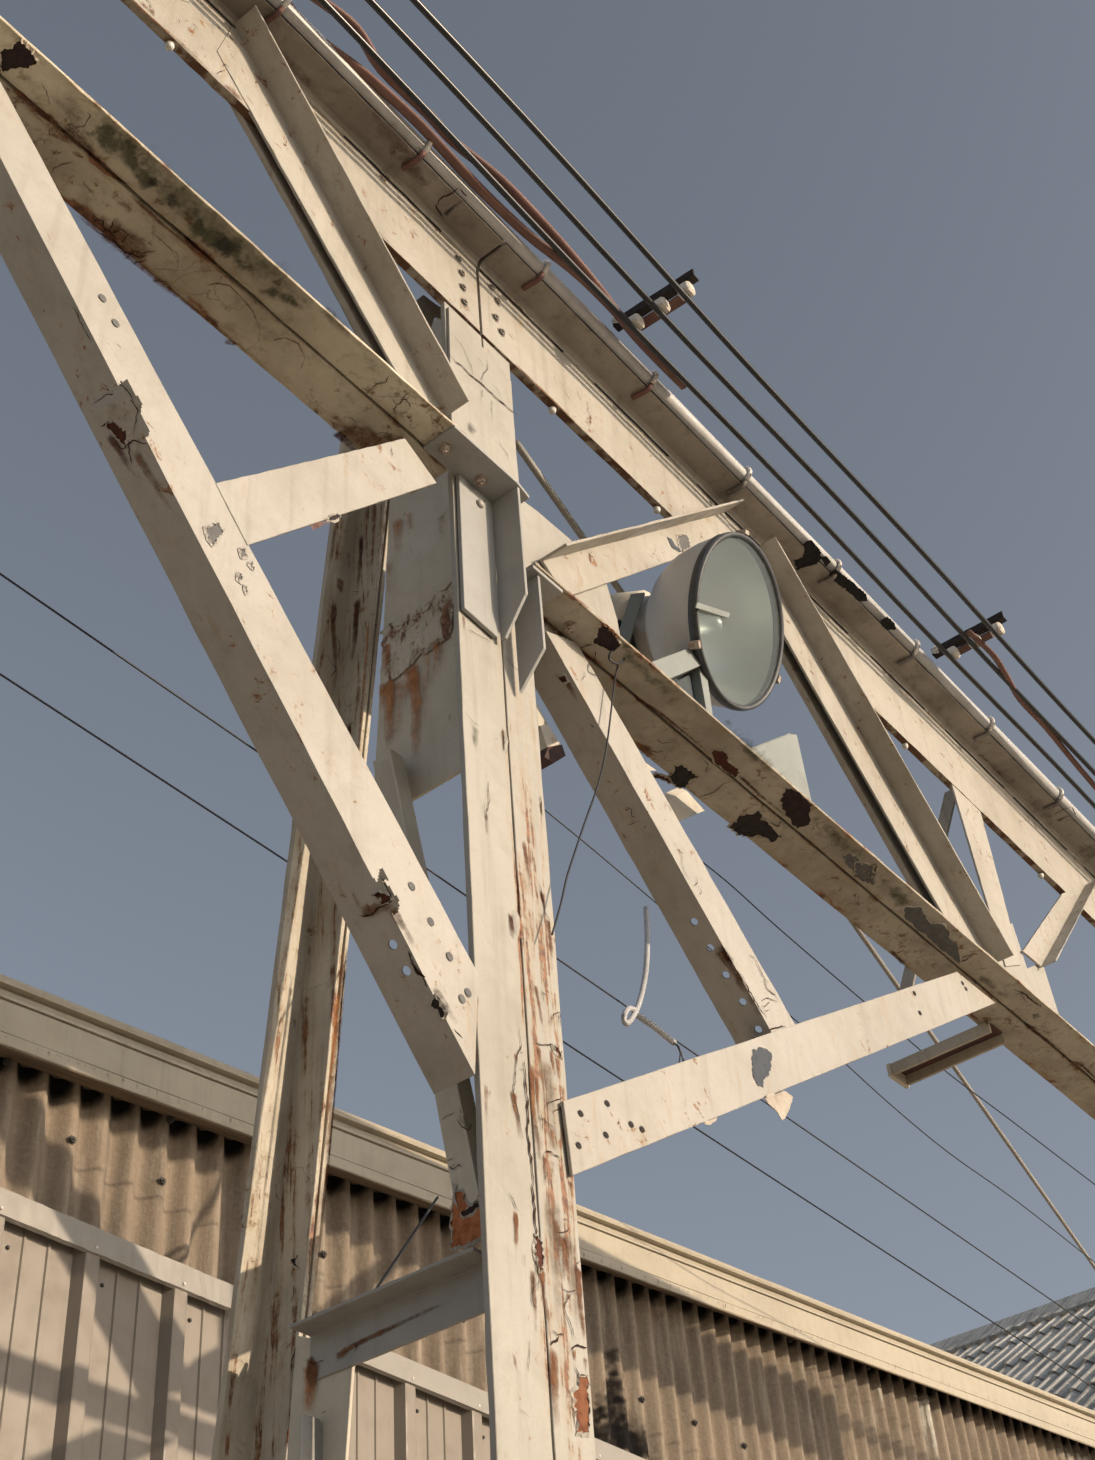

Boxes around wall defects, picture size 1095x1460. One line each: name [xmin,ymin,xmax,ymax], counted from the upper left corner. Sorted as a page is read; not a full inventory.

peeling [0,37,40,74]
water stain [99,124,298,306]
rust [329,537,438,738]
peeling [646,763,725,798]
peeling [726,788,812,843]
rust [349,868,411,940]
water stain [0,1057,244,1158]
rust [325,957,346,1171]
peeling [752,1047,793,1120]
water stain [326,1173,452,1229]
rust [510,1194,518,1243]
water stain [581,1260,1093,1460]